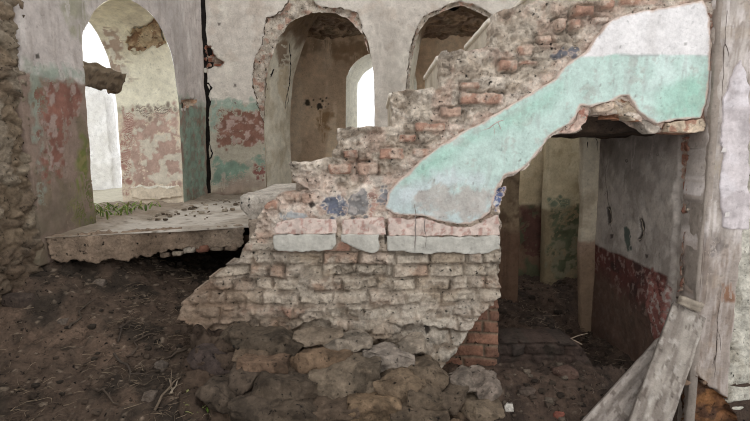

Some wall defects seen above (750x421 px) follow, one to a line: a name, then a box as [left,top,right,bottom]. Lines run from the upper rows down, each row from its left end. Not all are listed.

peeling [24,60,85,207]
crack [201,0,214,193]
peeling [118,0,371,200]
peeling [273,0,713,254]
peeling [719,60,750,229]
peeling [519,194,580,281]
peeling [643,232,685,340]